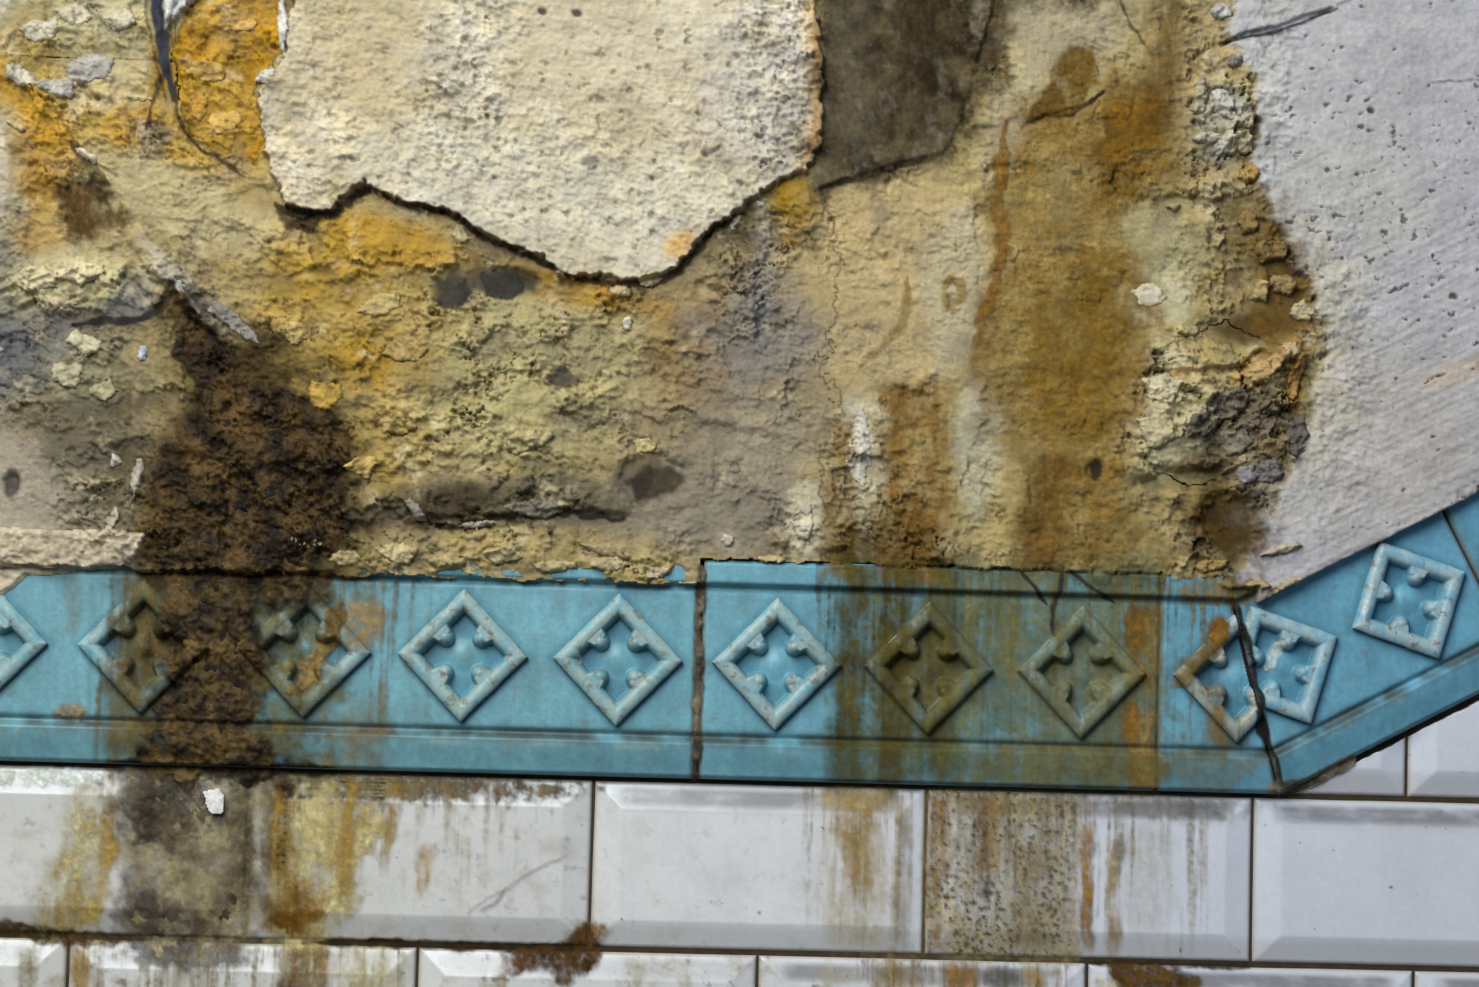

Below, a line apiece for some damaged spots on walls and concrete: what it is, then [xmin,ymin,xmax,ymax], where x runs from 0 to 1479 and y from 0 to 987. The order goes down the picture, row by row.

crack [145,0,245,177]
crack [274,184,744,288]
spalling [0,0,1331,597]
crack [817,156,927,189]
water stain [811,0,1014,195]
water stain [942,30,1178,790]
water stain [95,285,398,983]
rust [812,385,1253,987]
water stain [1186,490,1268,633]
rust [252,774,605,987]